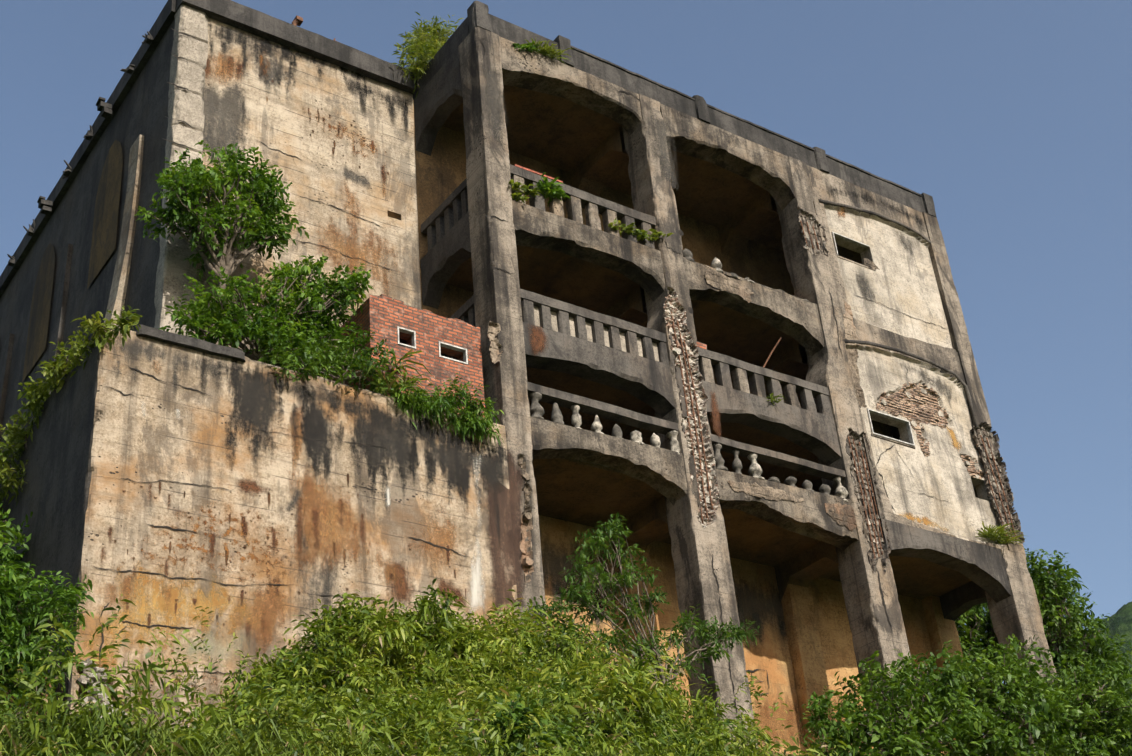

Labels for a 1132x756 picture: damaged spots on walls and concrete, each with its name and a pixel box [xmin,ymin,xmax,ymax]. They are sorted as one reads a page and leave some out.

rust [205,54,243,85]
water stain [202,23,408,159]
rust [303,108,386,168]
rust [88,470,412,667]
water stain [114,340,510,505]
rust [408,520,466,605]
water stain [471,558,484,607]
peeling [485,450,534,608]
spalling [662,286,805,528]
spalling [825,427,891,574]
spalling [843,300,949,457]
spalling [960,422,1025,545]